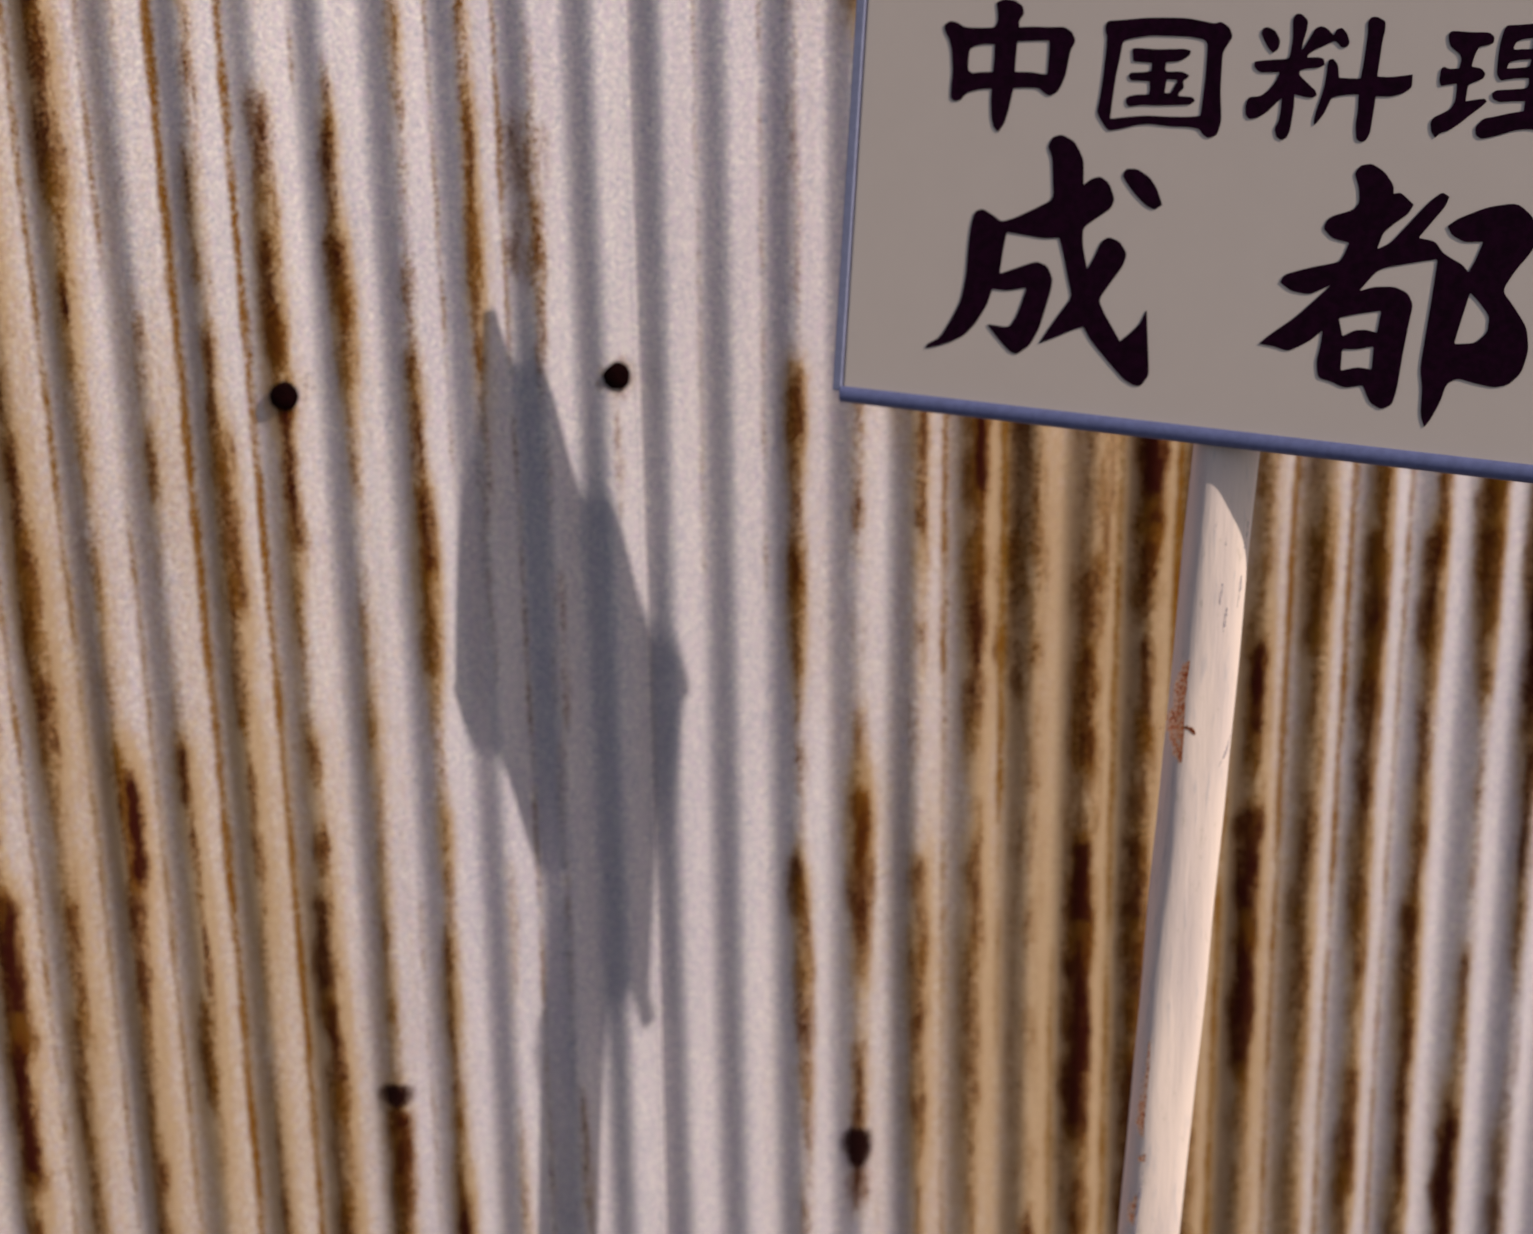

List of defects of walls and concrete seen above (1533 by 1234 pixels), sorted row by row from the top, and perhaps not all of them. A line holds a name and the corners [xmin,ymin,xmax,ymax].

rust [0,0,106,653]
rust [0,353,114,1234]
rust [79,516,226,1234]
rust [395,164,443,751]
rust [372,769,477,1234]
rust [784,357,809,722]
rust [786,838,817,1234]
rust [840,706,877,1211]
rust [1179,452,1453,1234]
rust [1427,944,1472,1234]
rust [1474,478,1511,725]
rust [1484,487,1533,1234]